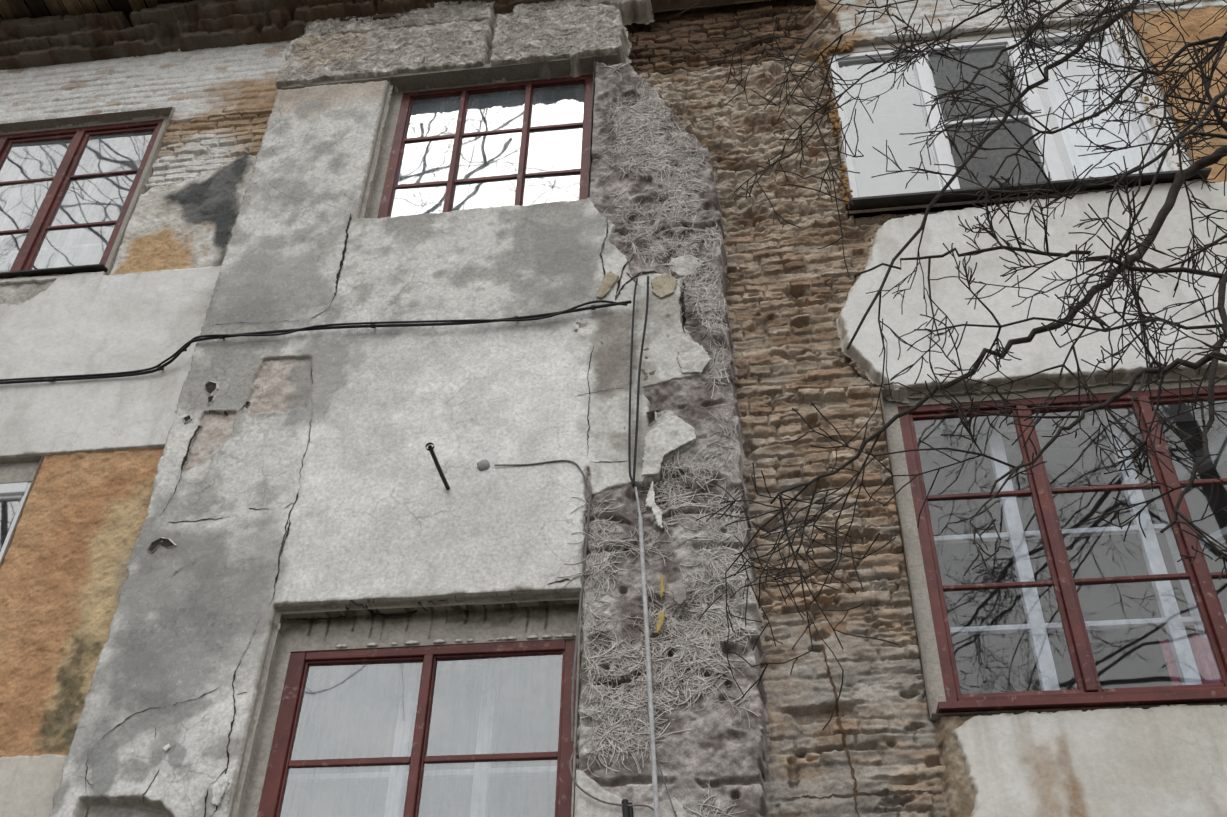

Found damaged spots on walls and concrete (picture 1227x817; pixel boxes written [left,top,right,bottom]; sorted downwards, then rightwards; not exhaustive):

spalling [144,108,271,192]
crack [215,213,352,325]
spalling [246,359,312,413]
spalling [557,0,991,817]
crack [85,367,467,817]
spalling [85,804,166,817]